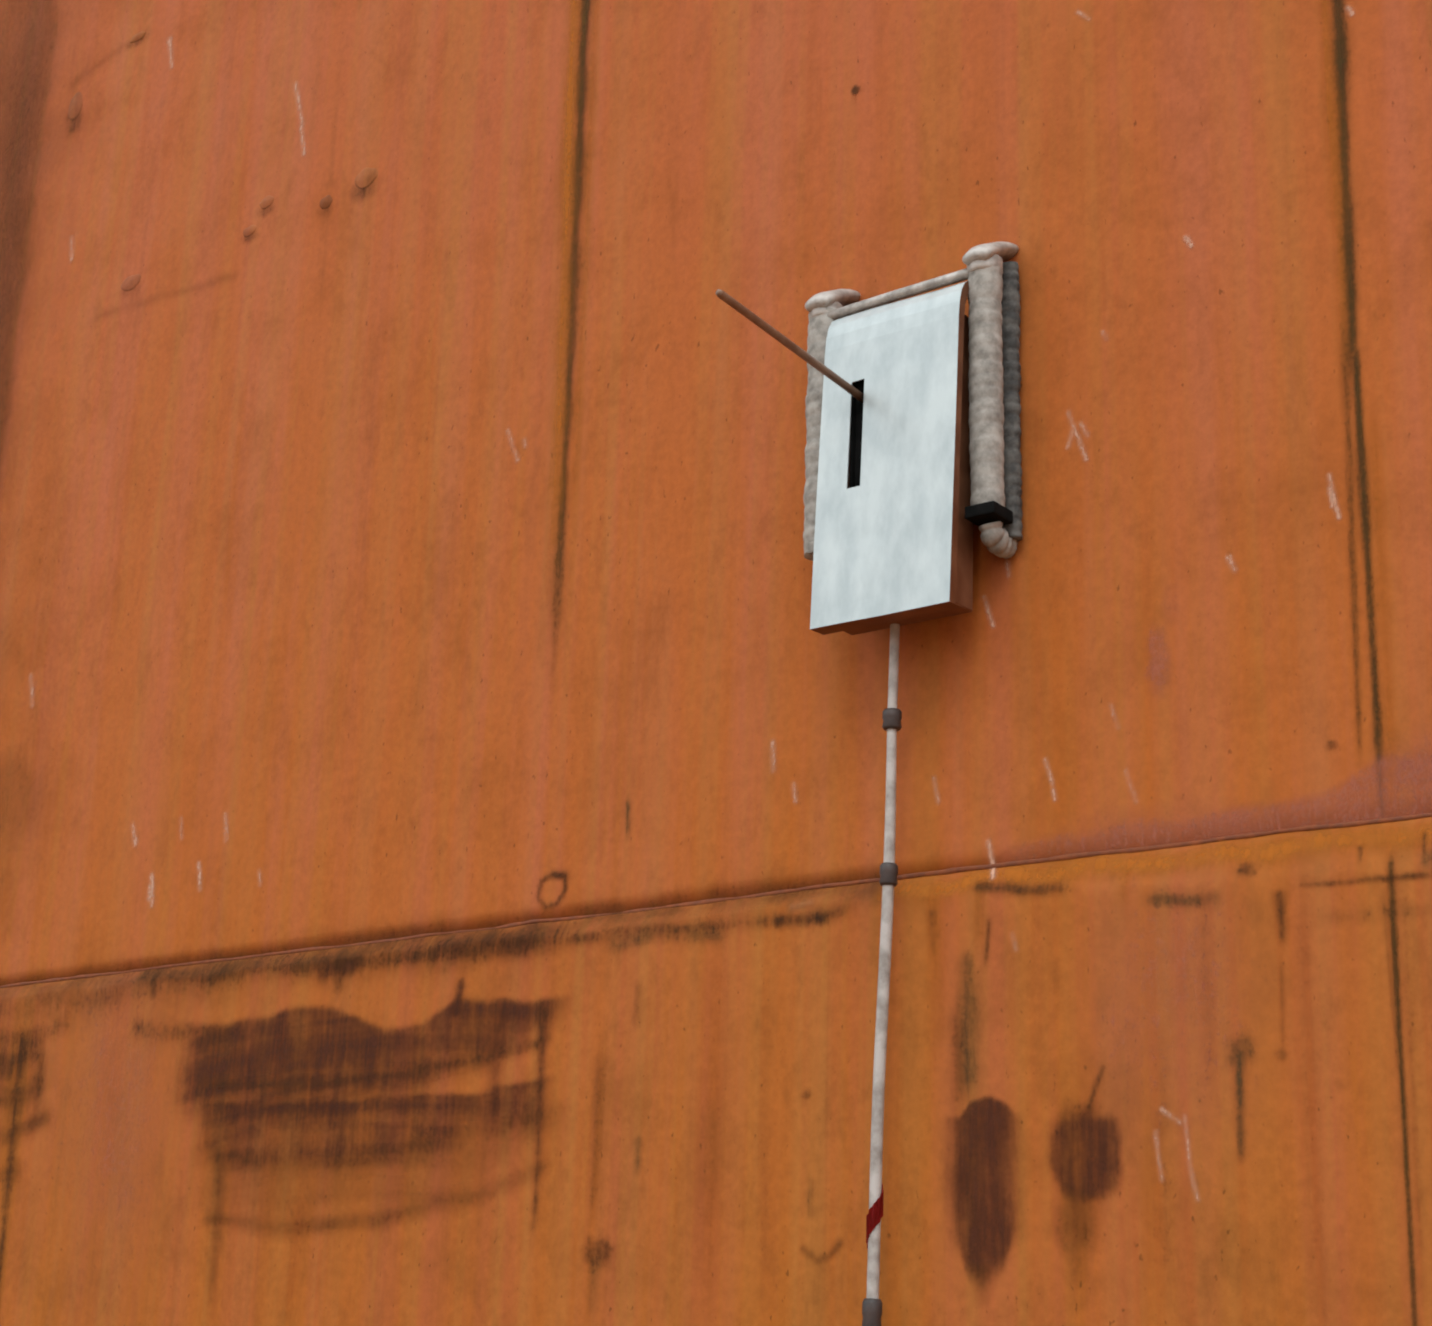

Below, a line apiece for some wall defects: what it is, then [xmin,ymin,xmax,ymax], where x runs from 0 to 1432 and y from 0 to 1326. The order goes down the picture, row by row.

rust [880,824,1432,899]